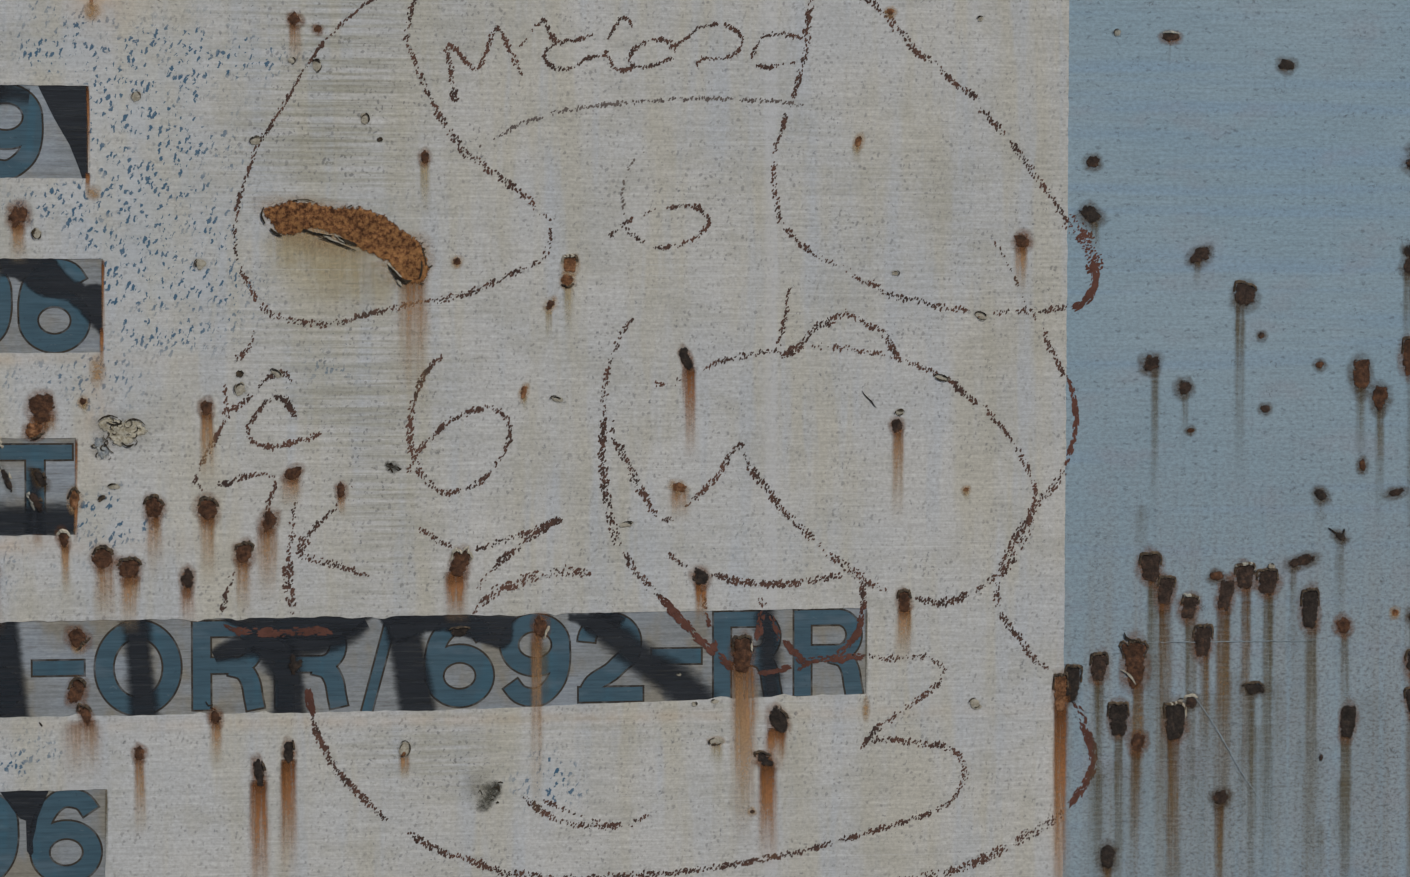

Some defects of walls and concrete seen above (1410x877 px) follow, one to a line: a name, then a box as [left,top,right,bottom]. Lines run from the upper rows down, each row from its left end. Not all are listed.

corrosion [261,199,433,326]
corrosion [26,393,55,440]
corrosion [679,347,695,413]
corrosion [1351,359,1388,444]
corrosion [91,545,142,605]
corrosion [143,494,165,534]
corrosion [197,496,219,541]
corrosion [234,511,279,585]
corrosion [1300,587,1320,699]
corrosion [731,634,789,827]
corrosion [1052,551,1315,847]
corrosion [252,740,295,854]